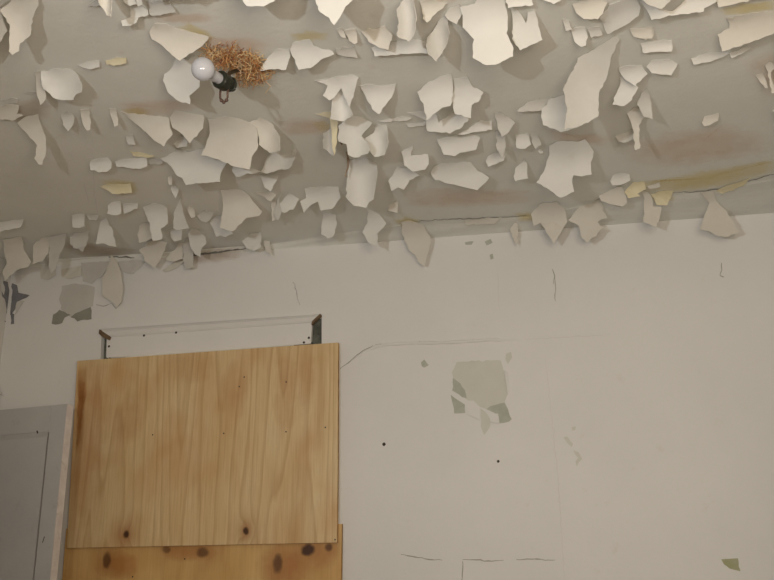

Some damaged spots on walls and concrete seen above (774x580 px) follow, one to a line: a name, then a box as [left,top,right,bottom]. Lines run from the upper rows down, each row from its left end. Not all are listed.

peeling [691,11,774,65]
peeling [756,61,774,93]
peeling [0,0,752,325]
peeling [451,360,511,434]
crack [462,558,553,578]